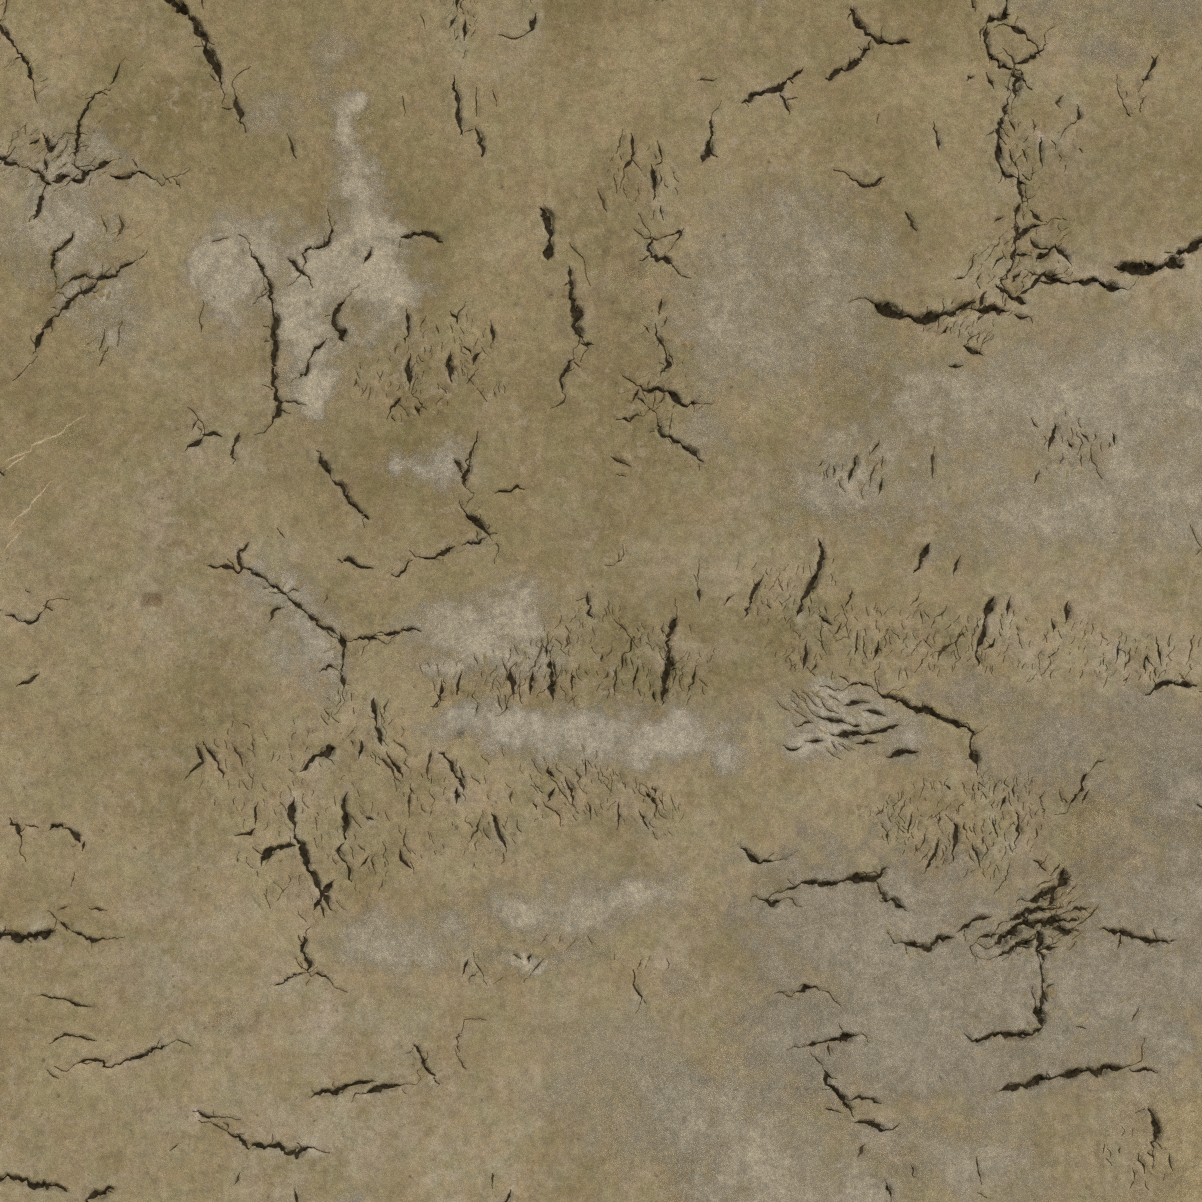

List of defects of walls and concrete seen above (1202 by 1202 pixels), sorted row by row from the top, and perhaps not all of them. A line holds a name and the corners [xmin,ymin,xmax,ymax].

crack [0,54,190,381]
crack [165,0,251,133]
crack [697,8,910,162]
crack [850,0,1202,325]
crack [616,213,715,470]
crack [208,542,423,714]
crack [0,817,125,956]
crack [741,847,1181,1092]
crack [0,1174,115,1202]
crack [193,1109,330,1185]
crack [311,1018,486,1101]
crack [774,984,900,1157]